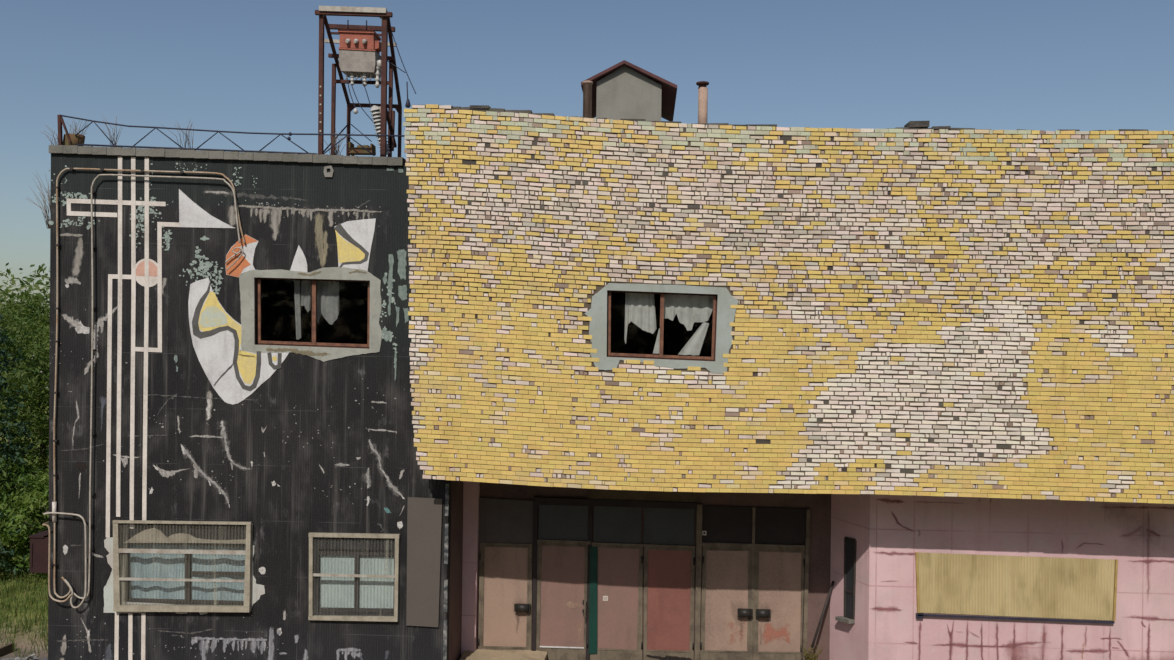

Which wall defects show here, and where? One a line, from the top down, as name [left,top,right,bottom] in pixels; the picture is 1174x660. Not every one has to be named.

damp [205,191,381,276]
spalling [153,461,186,480]
crack [1062,518,1160,591]
crack [907,623,1150,660]